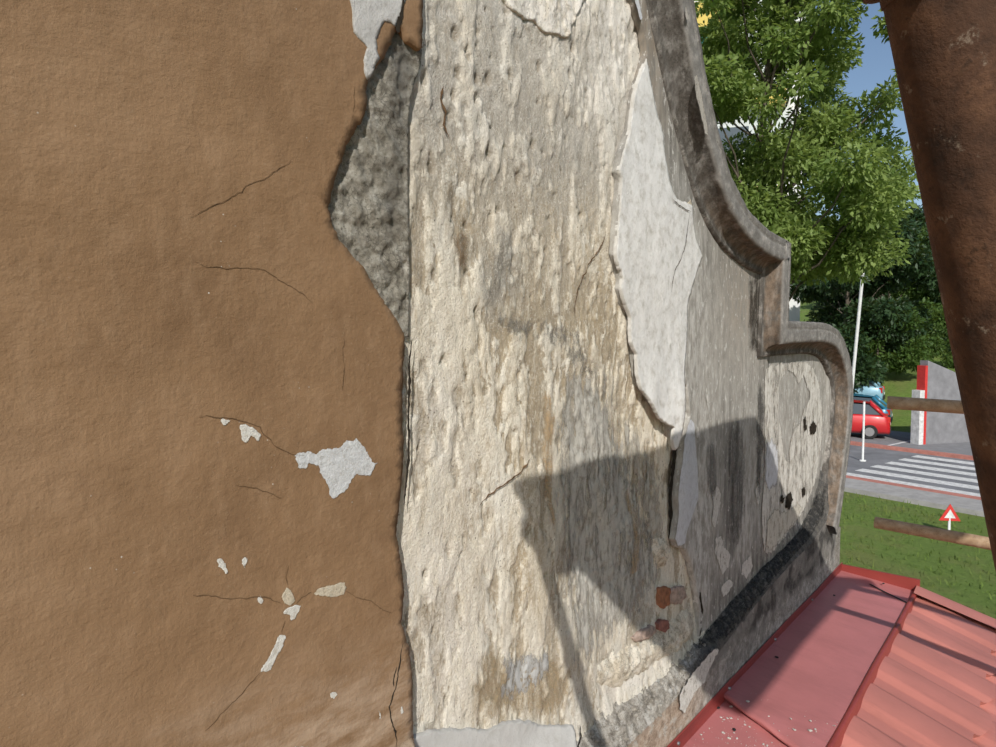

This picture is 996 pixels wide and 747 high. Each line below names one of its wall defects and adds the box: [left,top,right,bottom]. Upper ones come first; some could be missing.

crack [396,0,404,33]
spalling [694,75,708,135]
crack [194,164,287,216]
spalling [328,0,422,337]
crack [197,262,309,300]
peeling [613,58,703,569]
peeling [295,438,377,498]
peeling [762,360,823,554]
crack [193,569,311,632]
flaking render [631,586,687,642]
crack [389,649,402,745]
peeling [590,642,719,747]